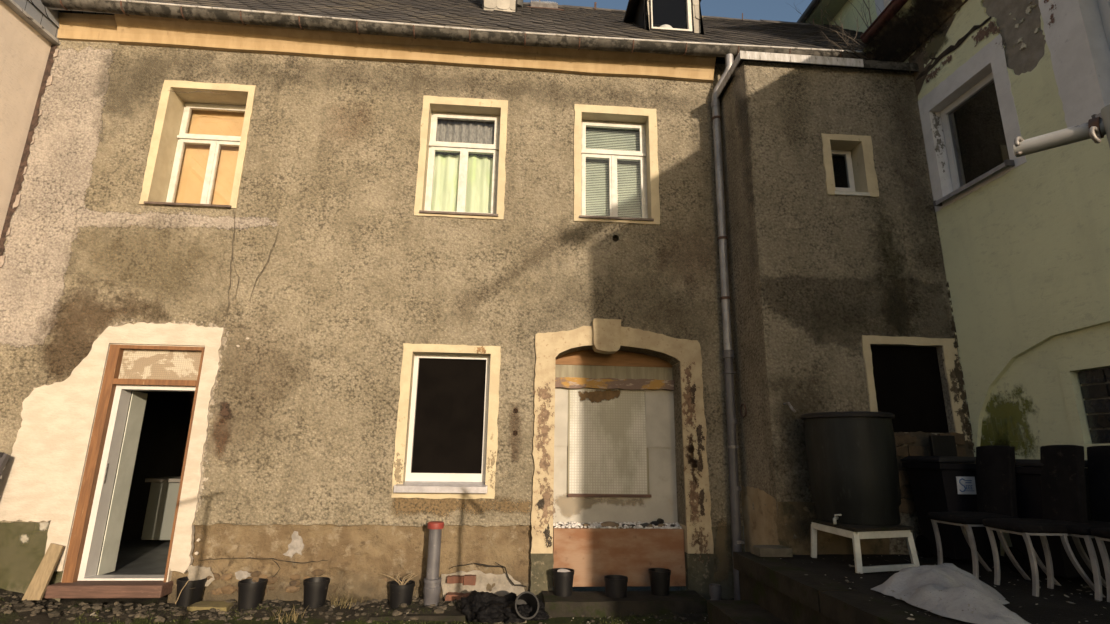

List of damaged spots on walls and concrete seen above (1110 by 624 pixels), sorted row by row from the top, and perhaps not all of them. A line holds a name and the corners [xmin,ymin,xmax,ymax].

spalling [971,0,1056,75]
water stain [45,294,164,380]
peeling [533,382,556,548]
peeling [679,362,709,563]
spalling [207,541,389,595]
spalling [441,570,525,601]